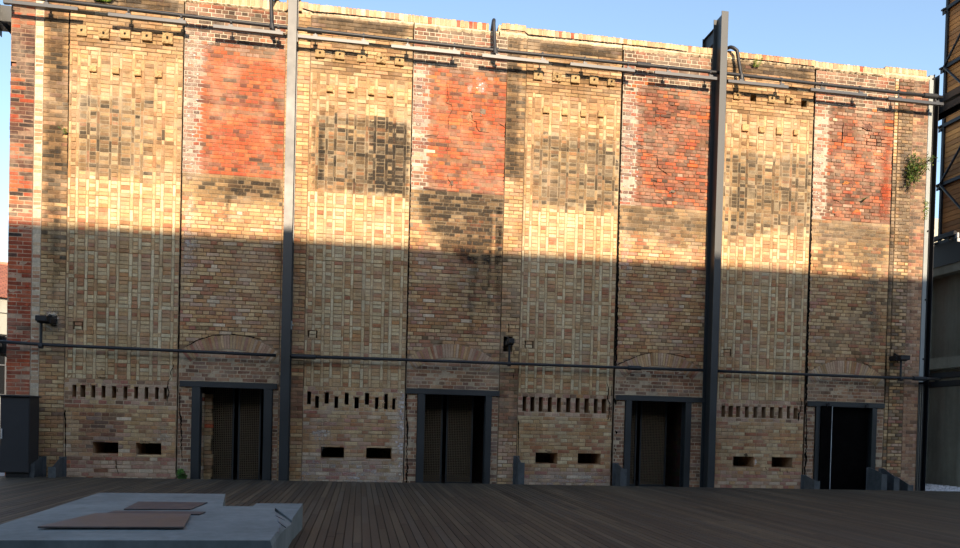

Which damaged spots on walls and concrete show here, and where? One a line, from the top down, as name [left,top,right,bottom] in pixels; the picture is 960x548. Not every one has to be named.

crack [167,75,262,458]
crack [406,91,506,364]
crack [607,117,686,451]